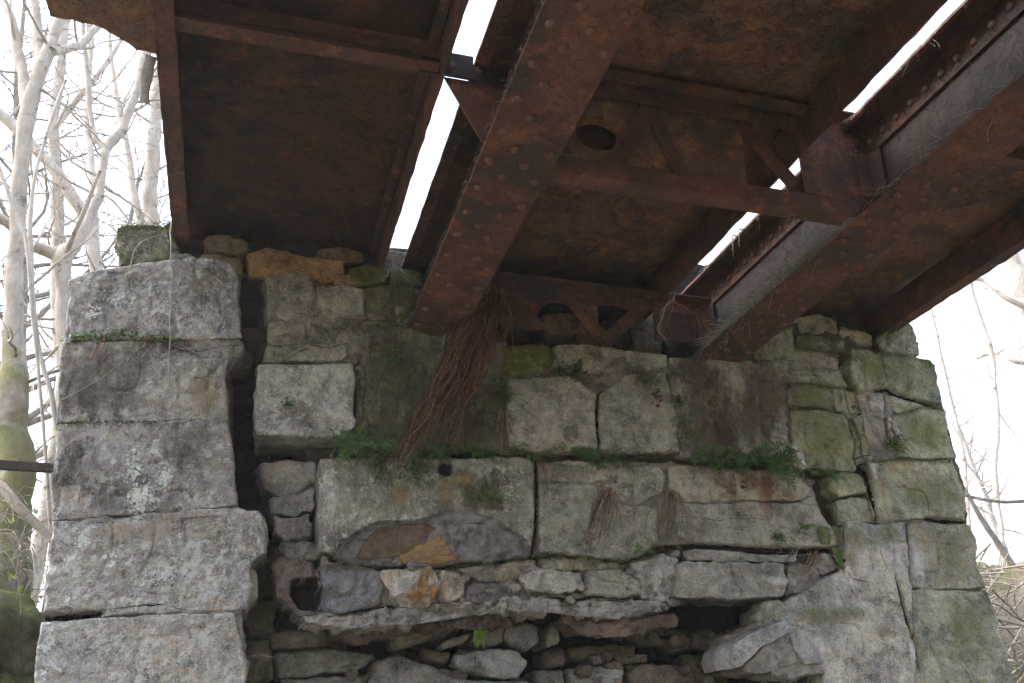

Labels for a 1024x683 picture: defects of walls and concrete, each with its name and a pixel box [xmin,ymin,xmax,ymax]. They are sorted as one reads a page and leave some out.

water stain [361,325,498,452]
water stain [679,356,789,466]
crack [678,389,936,667]